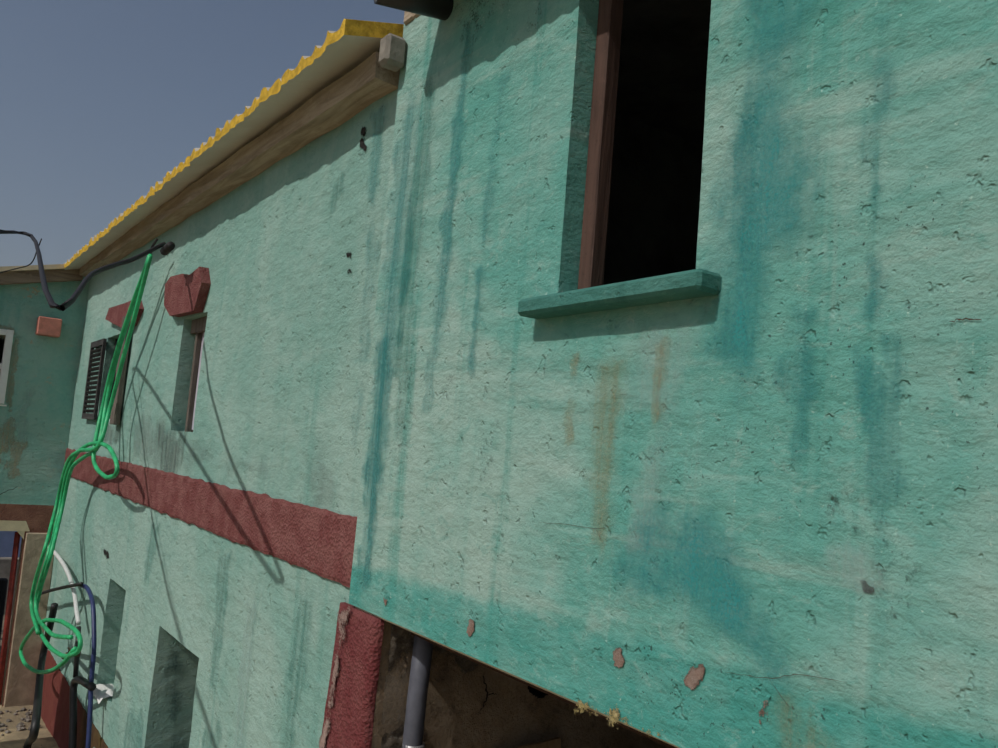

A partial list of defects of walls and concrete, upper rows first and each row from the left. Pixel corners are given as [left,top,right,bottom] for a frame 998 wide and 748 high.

peeling [0,326,18,408]
spalling [388,624,415,671]
spalling [433,645,479,674]
spalling [613,642,626,668]
peeling [319,603,351,748]
spalling [528,686,548,698]
spalling [683,664,705,690]
spalling [381,717,405,748]
peeling [574,700,663,737]